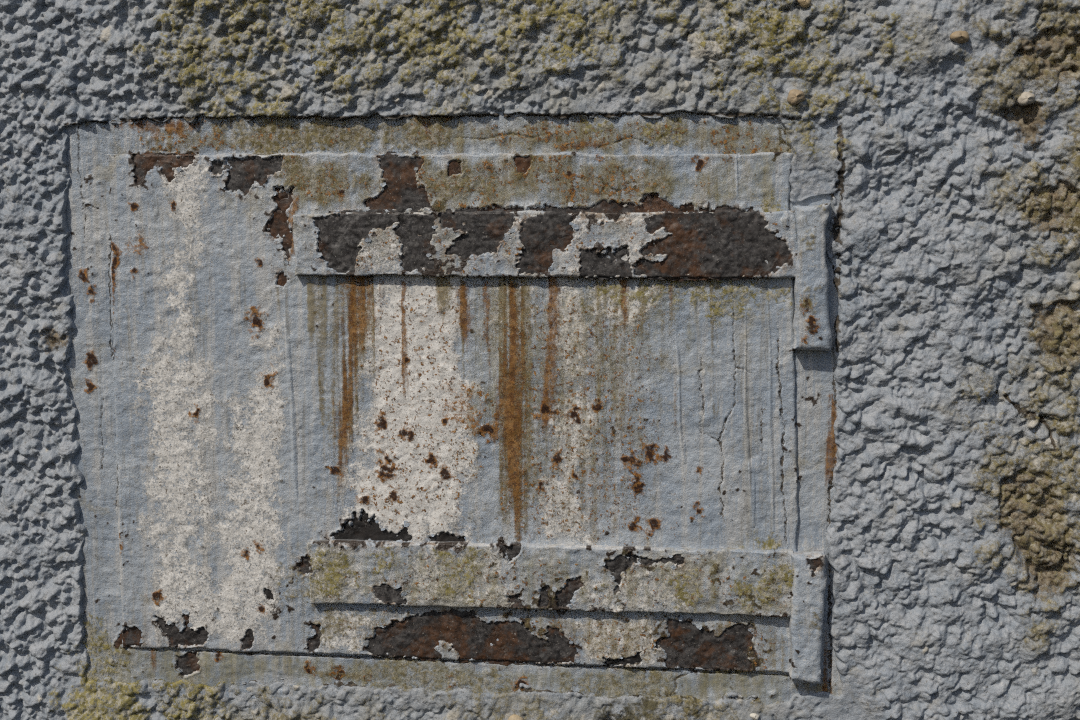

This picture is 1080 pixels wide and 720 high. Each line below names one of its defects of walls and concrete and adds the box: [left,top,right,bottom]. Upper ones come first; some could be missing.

peeling [114,151,295,675]
rust [307,228,677,605]
peeling [299,151,792,671]
rust [525,555,793,666]